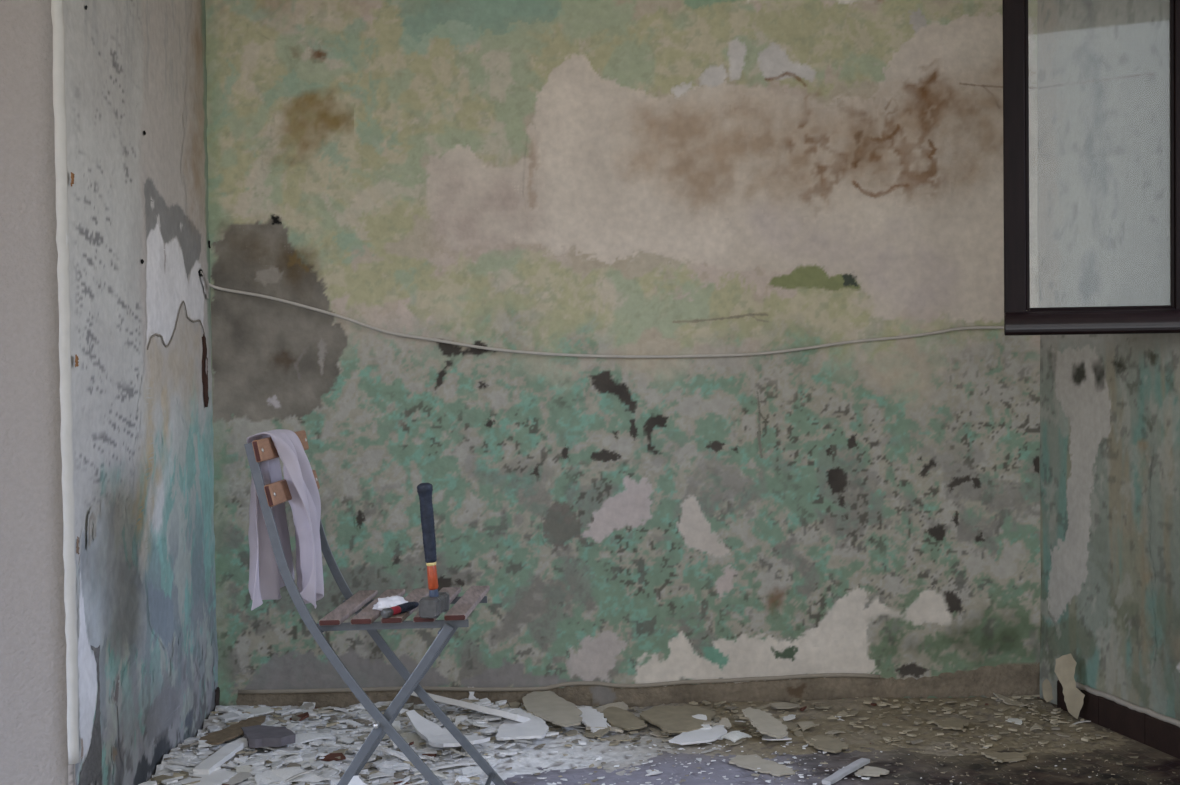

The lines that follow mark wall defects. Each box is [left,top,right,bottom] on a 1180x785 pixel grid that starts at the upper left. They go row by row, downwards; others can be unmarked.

peeling [418,11,1004,331]
rust [722,58,975,223]
peeling [1026,16,1039,311]
damp [75,295,218,785]
flaking render [143,175,351,424]
flaking render [433,338,499,395]
peeling [540,370,670,552]
peeling [675,492,741,598]
peeling [1046,343,1113,645]
damp [1046,347,1154,435]
peeling [78,568,121,785]
flaking render [215,585,1085,745]